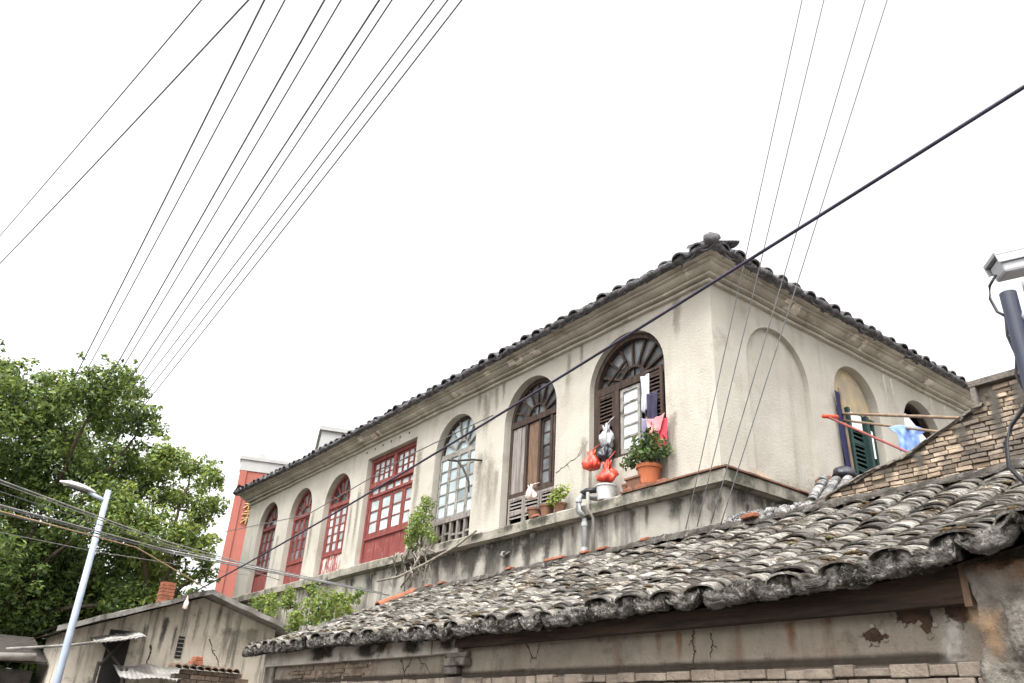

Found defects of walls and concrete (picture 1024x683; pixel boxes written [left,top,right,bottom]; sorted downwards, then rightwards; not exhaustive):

water stain [391,515,576,584]
water stain [160,618,177,642]
crack [688,630,717,662]
spalling [859,606,978,656]